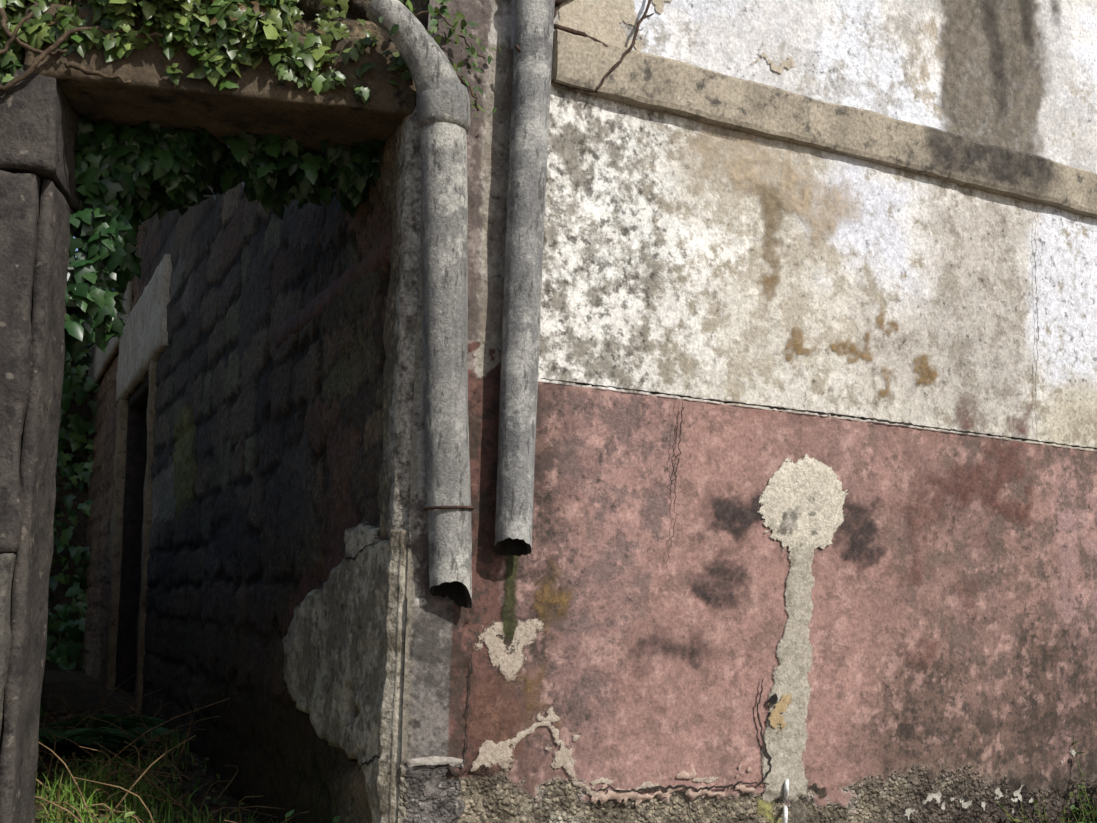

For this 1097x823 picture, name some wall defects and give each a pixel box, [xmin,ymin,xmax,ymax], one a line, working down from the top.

water stain [929,0,1054,190]
spalling [282,521,757,823]
crack [591,679,772,819]
spalling [769,693,792,733]
spalling [805,776,834,798]